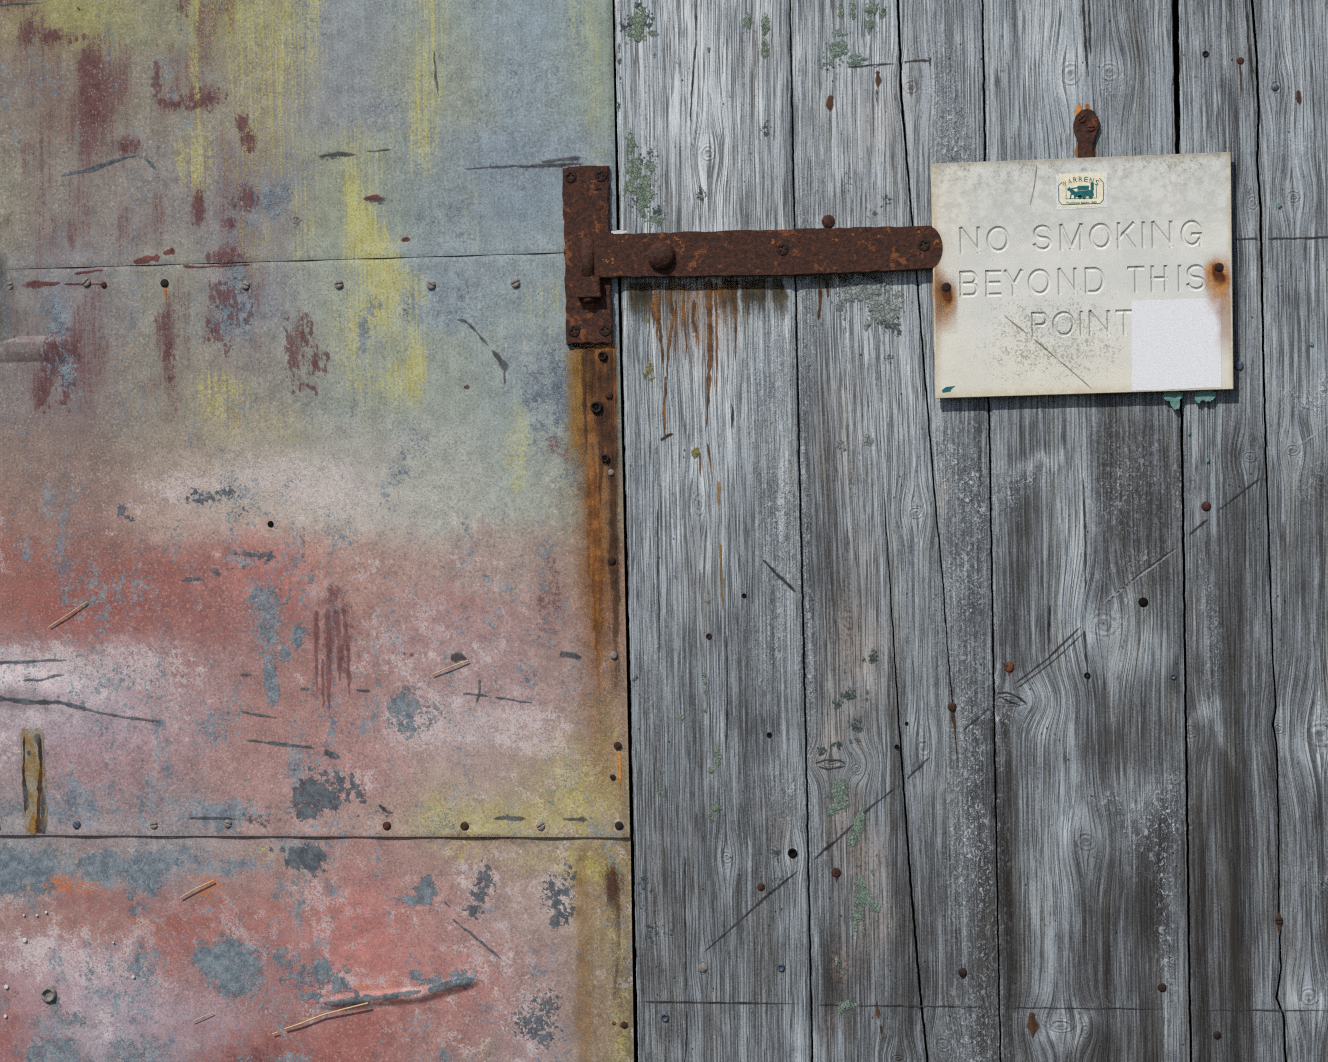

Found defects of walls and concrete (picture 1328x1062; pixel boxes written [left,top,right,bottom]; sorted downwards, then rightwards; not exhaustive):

rust [815,275,882,319]
rust [1206,261,1229,296]
rust [629,278,788,506]
rust [569,343,620,675]
crack [1244,0,1287,1062]
peeling [385,680,446,740]
rust [20,728,47,834]
peeling [291,764,392,819]
crack [884,496,928,1062]
peeling [0,841,199,918]
peeling [269,841,334,878]
peeling [184,932,354,1008]